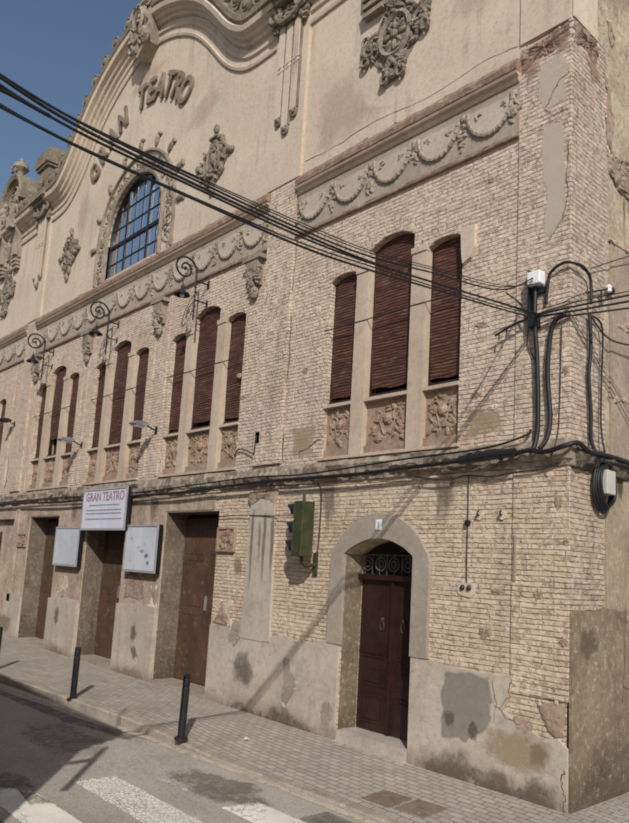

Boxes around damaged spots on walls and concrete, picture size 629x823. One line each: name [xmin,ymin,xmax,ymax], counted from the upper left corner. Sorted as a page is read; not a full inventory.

spalling [520,17,629,201]
peeling [281,657,298,708]
crack [492,680,520,725]
water stain [426,755,473,782]
water stain [488,732,545,771]
water stain [477,774,554,809]